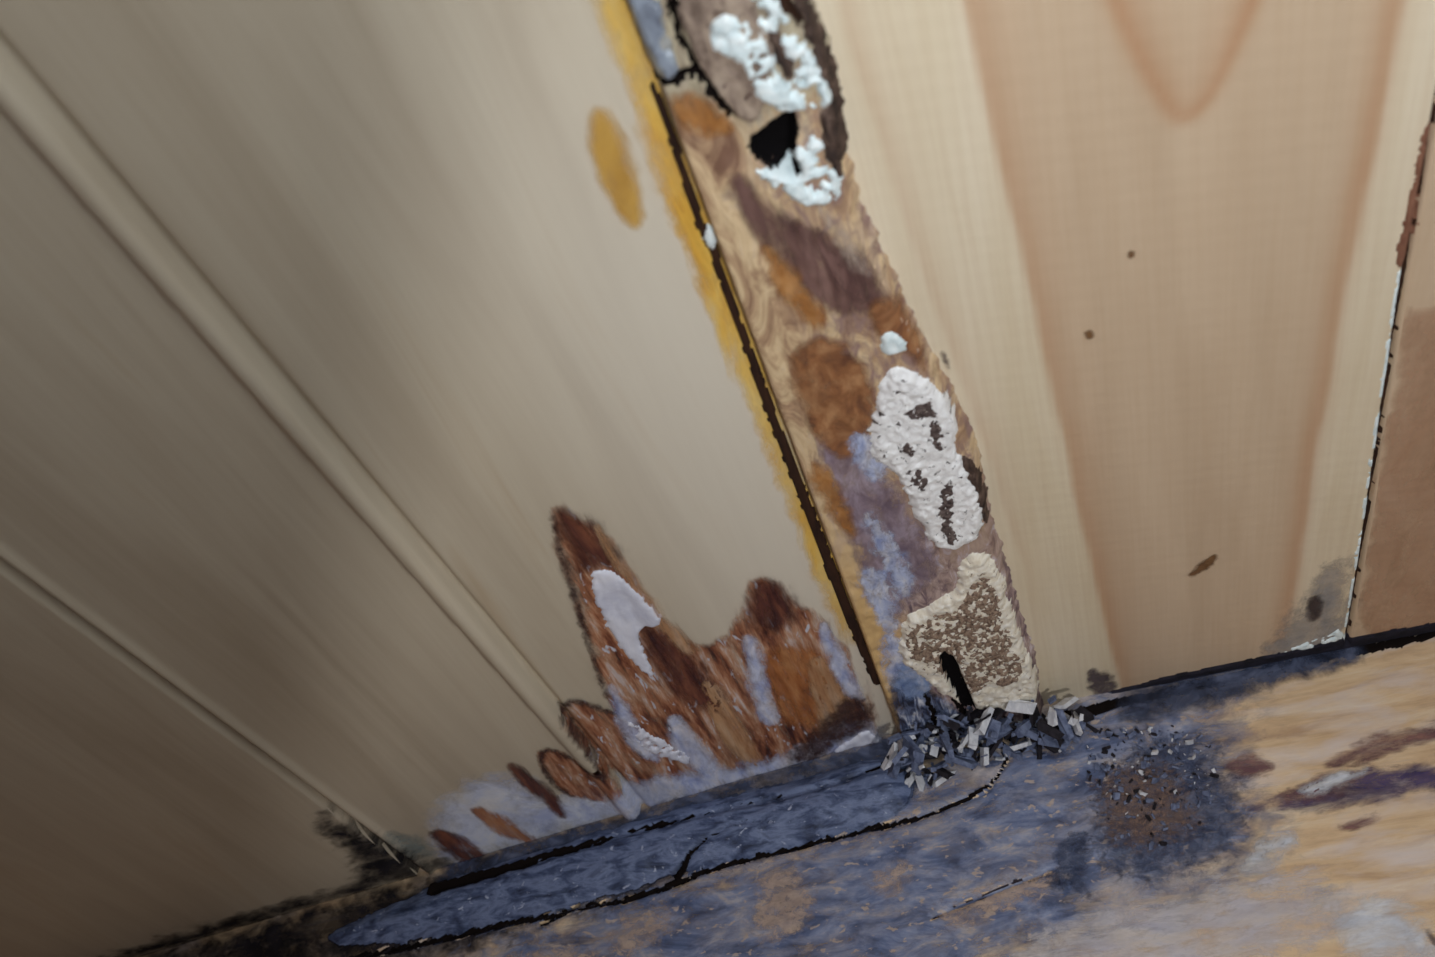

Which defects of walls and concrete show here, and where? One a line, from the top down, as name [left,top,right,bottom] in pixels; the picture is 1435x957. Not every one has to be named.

spalling [626,0,832,123]
damp [592,111,641,226]
peeling [755,135,844,206]
crack [650,0,880,685]
damp [602,0,939,736]
peeling [880,332,907,355]
damp [553,511,658,761]
peeling [591,569,662,676]
peeling [628,722,690,764]
damp [120,620,1435,957]
peeling [835,730,881,752]